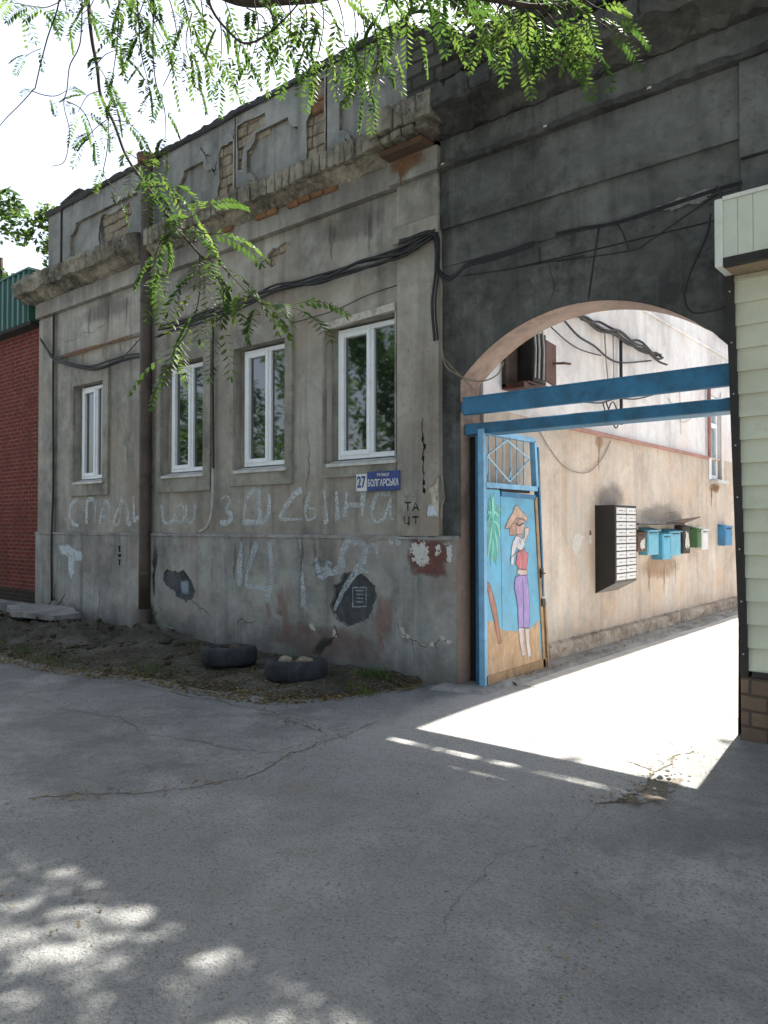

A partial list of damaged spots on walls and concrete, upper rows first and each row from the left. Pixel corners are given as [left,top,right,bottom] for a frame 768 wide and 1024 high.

flaking render [305,76,326,159]
flaking render [217,112,272,196]
corrosion [391,153,420,186]
flaking render [98,202,134,244]
crack [419,418,427,495]
flaking render [425,473,445,518]
flaking render [162,568,195,605]
flaking render [330,571,377,639]
peeling [408,540,453,575]
crack [398,623,456,674]
crack [34,681,379,798]
crack [382,751,694,938]